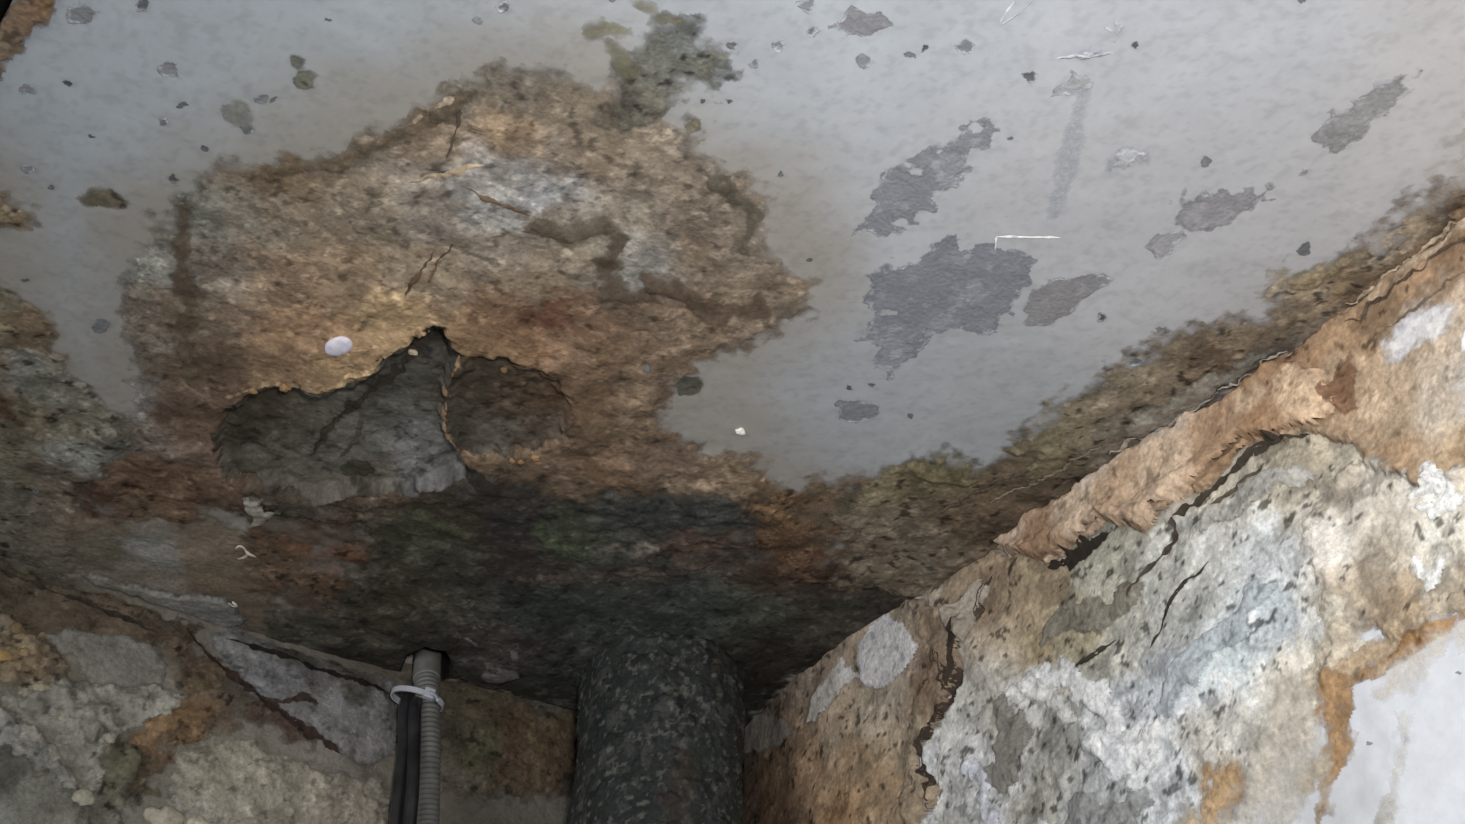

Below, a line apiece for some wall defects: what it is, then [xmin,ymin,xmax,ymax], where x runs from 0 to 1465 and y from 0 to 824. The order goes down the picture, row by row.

peeling [856,117,1013,237]
peeling [955,38,975,55]
peeling [1022,71,1038,83]
peeling [1145,184,1273,259]
peeling [1311,70,1422,154]
water stain [0,0,820,646]
spalling [210,326,576,528]
water stain [250,178,1465,727]
flaking render [742,218,1465,824]
flaking render [0,611,187,824]
flaking render [166,736,392,824]
rust [1302,586,1465,824]